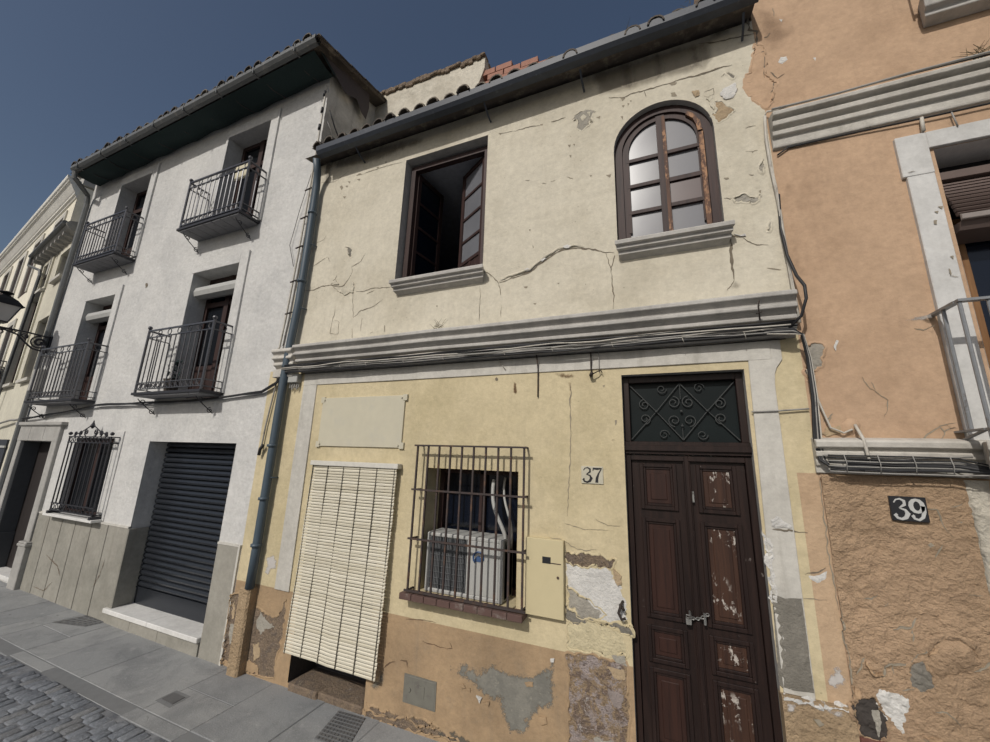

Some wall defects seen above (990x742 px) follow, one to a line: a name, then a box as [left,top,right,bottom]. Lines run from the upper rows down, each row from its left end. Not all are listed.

peeling [692,43,788,124]
crack [305,236,388,333]
crack [479,244,615,317]
peeling [245,599,287,680]
peeling [761,516,814,693]
peeling [457,651,633,742]
spalling [847,687,910,742]